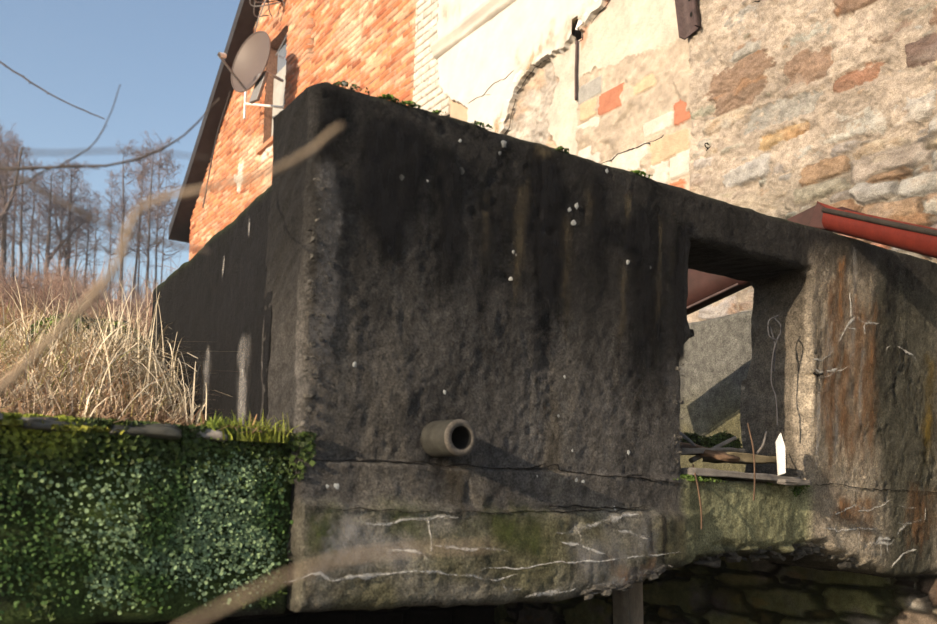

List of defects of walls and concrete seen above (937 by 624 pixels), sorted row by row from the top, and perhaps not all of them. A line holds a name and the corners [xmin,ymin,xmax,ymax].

flaking render [575,0,679,77]
flaking render [498,53,559,148]
water stain [357,116,426,261]
water stain [516,144,569,339]
water stain [673,222,693,363]
crack [840,293,879,341]
crack [813,357,847,377]
crack [300,458,680,484]
crack [291,504,669,582]
crack [816,483,937,565]
crack [528,588,576,597]